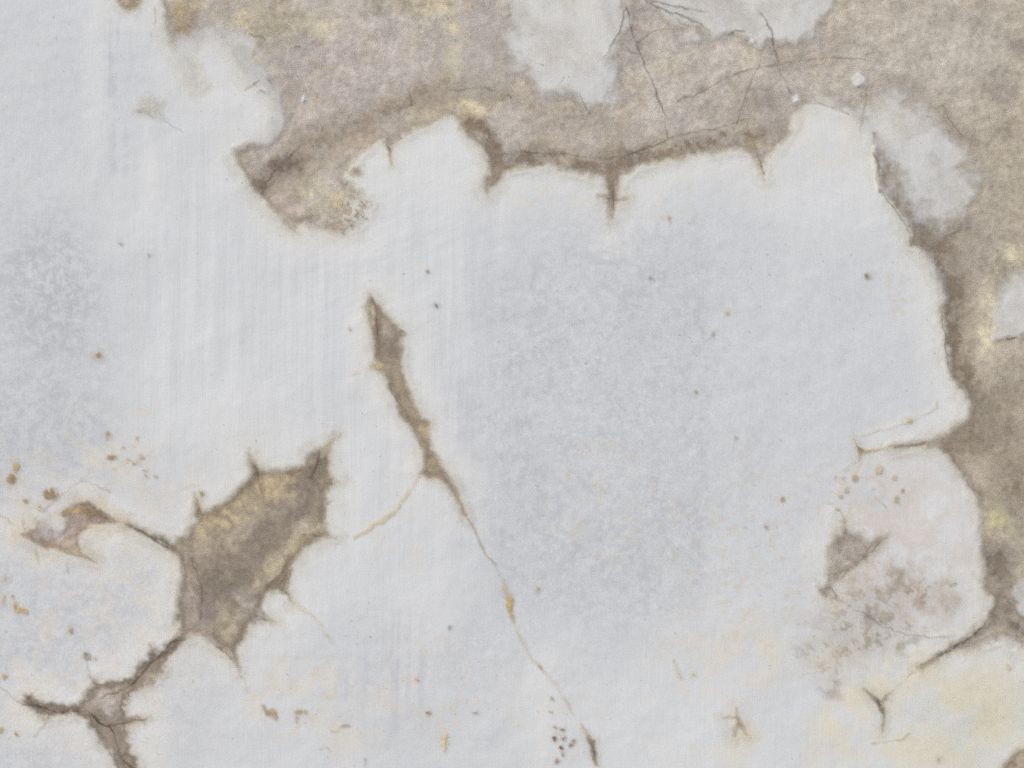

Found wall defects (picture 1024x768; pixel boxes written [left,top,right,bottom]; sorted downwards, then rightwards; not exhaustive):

peeling [163,0,829,236]
crack [355,297,467,537]
peeling [23,440,338,670]
crack [505,595,513,620]